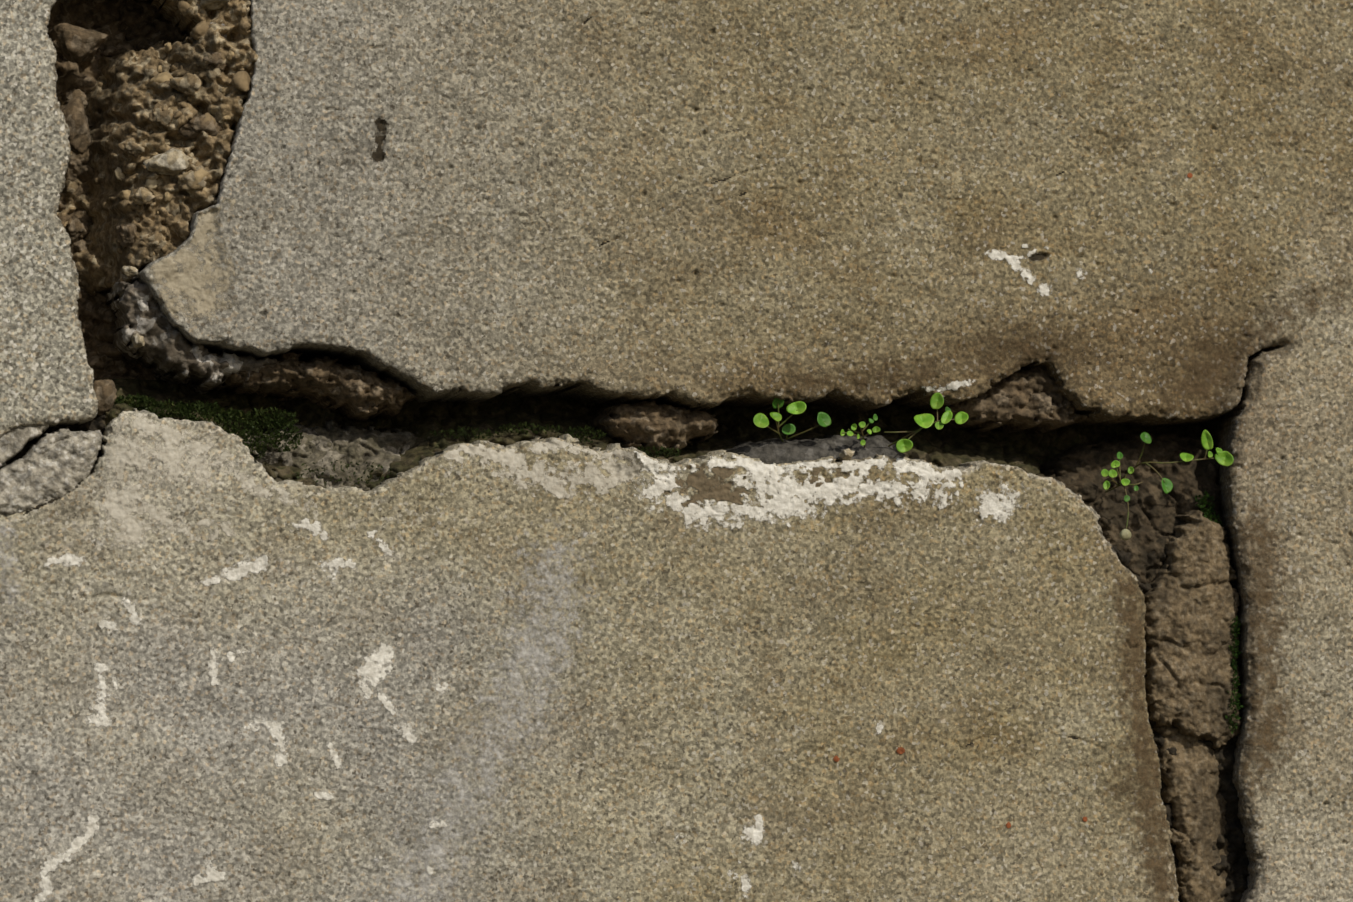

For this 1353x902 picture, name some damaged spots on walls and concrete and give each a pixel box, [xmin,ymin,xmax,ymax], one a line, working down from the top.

spalling [57,0,277,394]
crack [6,0,1223,491]
spalling [921,365,1090,435]
crack [23,485,78,515]
leakage [438,439,964,532]
spalling [664,463,750,507]
spalling [798,467,843,487]
leakage [974,484,1025,526]
crack [1112,545,1167,594]
crack [1144,551,1249,902]